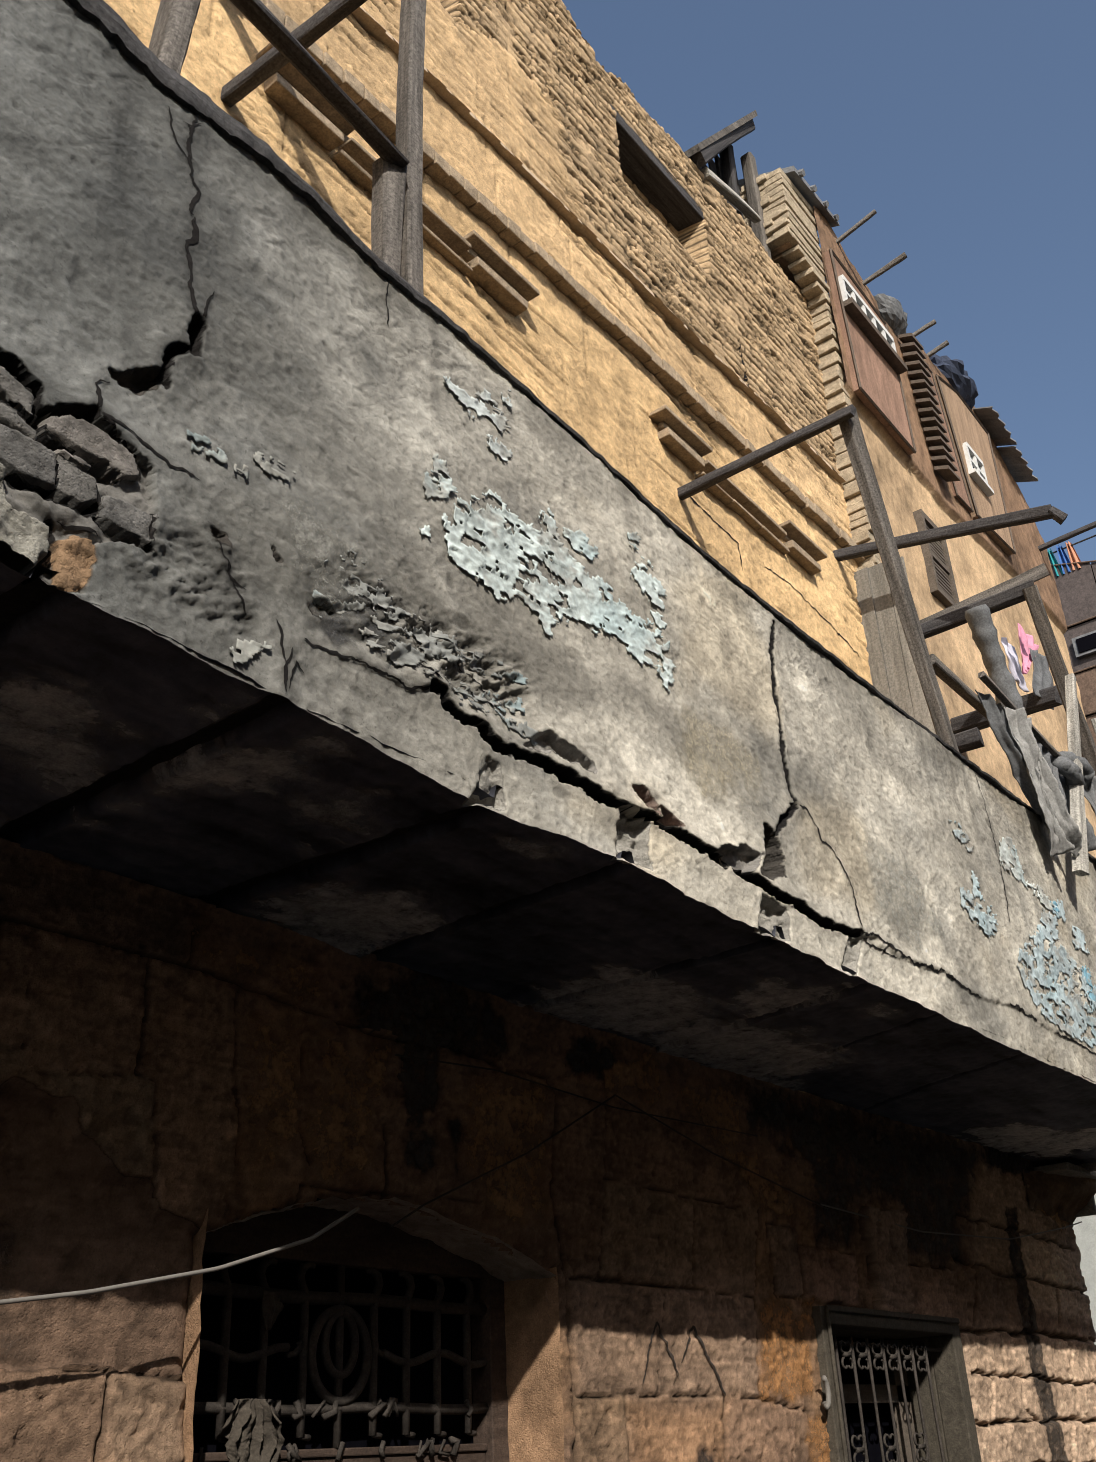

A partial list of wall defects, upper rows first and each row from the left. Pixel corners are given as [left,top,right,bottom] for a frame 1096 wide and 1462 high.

crack [152,107,214,390]
crack [738,338,749,386]
spalling [0,366,161,592]
peeling [307,549,597,774]
peeling [419,454,676,692]
crack [690,497,859,656]
water stain [258,884,444,955]
crack [217,540,1096,1055]
peeling [949,820,998,940]
peeling [999,836,1096,1049]
water stain [517,964,1096,1265]